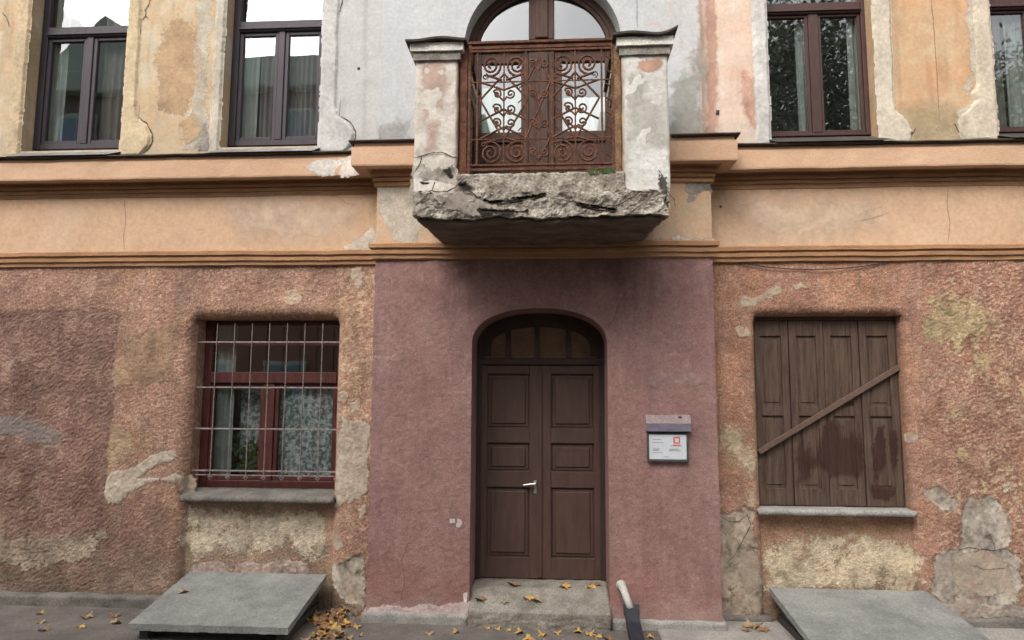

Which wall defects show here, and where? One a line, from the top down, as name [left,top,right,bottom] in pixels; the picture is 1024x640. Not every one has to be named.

peeling [153,0,214,152]
peeling [957,0,976,138]
peeling [306,156,359,178]
crack [415,152,481,199]
crack [552,170,675,209]
spalling [658,174,669,206]
flaking render [104,391,471,615]
spalling [718,419,1024,619]